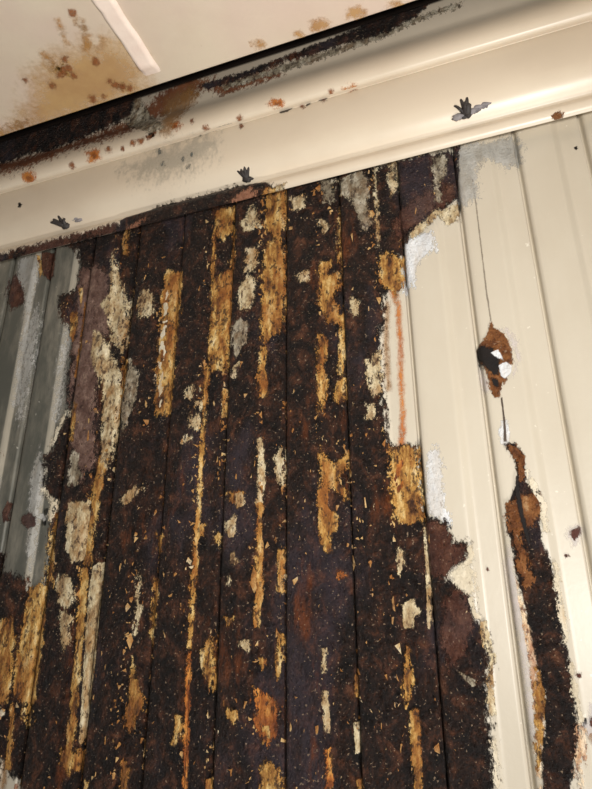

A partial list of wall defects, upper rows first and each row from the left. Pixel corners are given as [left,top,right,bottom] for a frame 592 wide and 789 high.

rust [0,1,462,182]
rust [0,145,502,789]
peeling [424,443,453,527]
peeling [446,560,479,598]
rust [504,442,592,789]